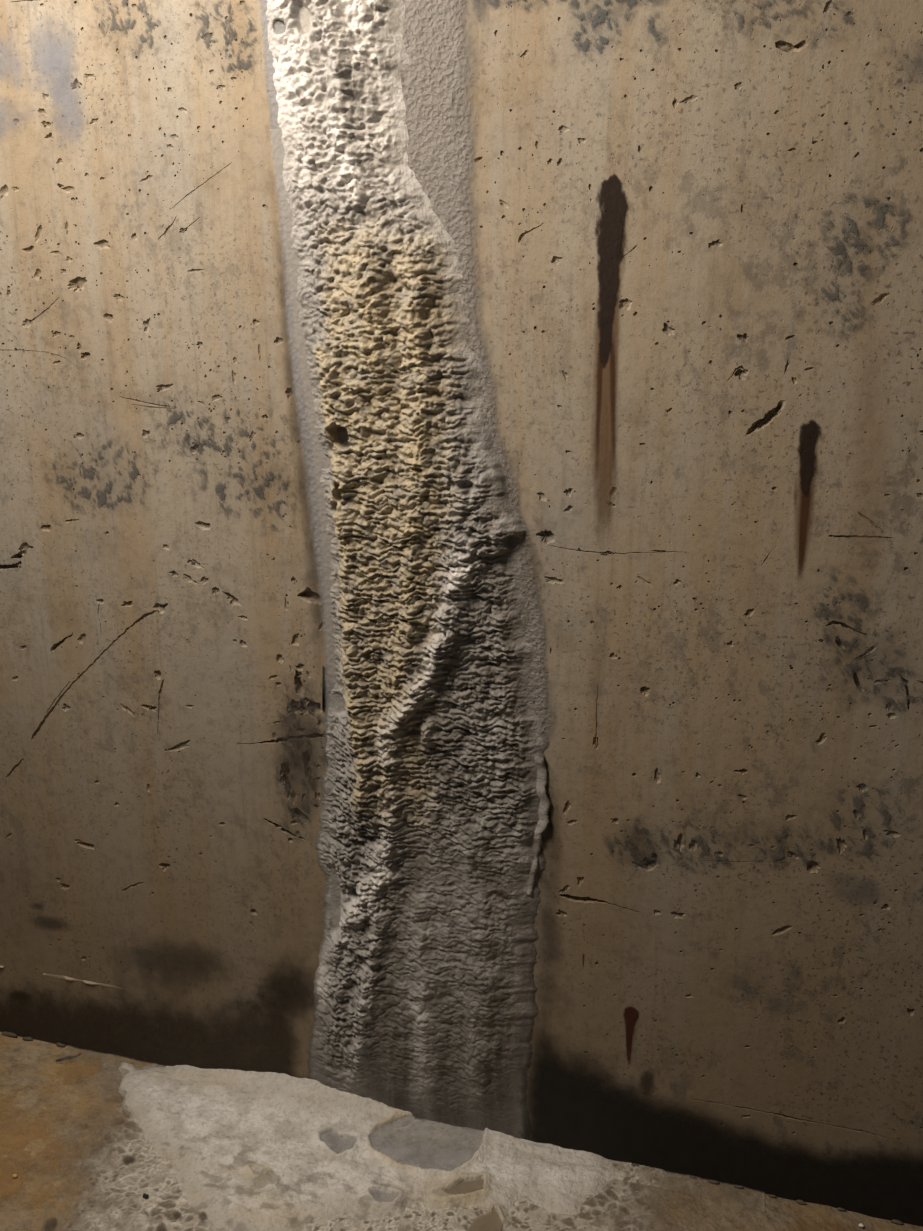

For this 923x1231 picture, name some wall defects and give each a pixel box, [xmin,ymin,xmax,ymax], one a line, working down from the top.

spalling [477,181,546,236]
rust [594,174,628,516]
rust [794,420,821,568]
crack [51,603,101,652]
spalling [265,485,323,729]
rust [624,1007,638,1062]
leakage [0,992,923,1231]